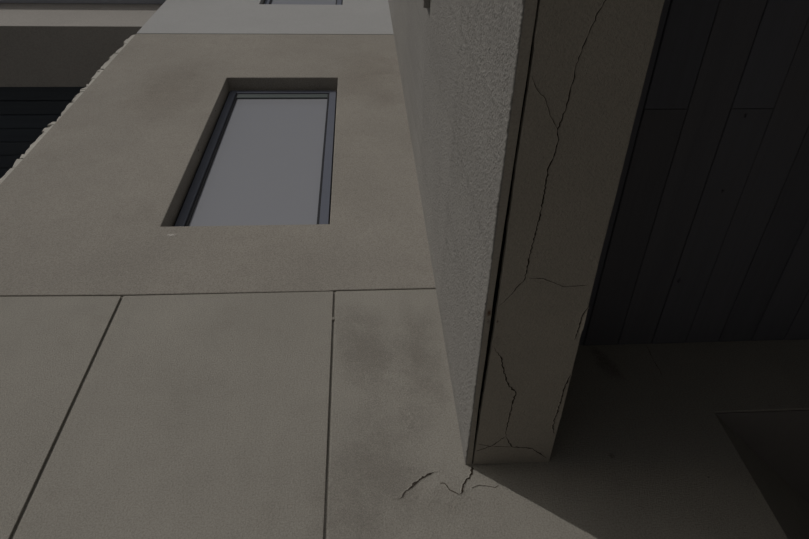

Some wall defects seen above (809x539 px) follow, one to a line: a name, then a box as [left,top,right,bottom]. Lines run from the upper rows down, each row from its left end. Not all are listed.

crack [393,0,607,500]